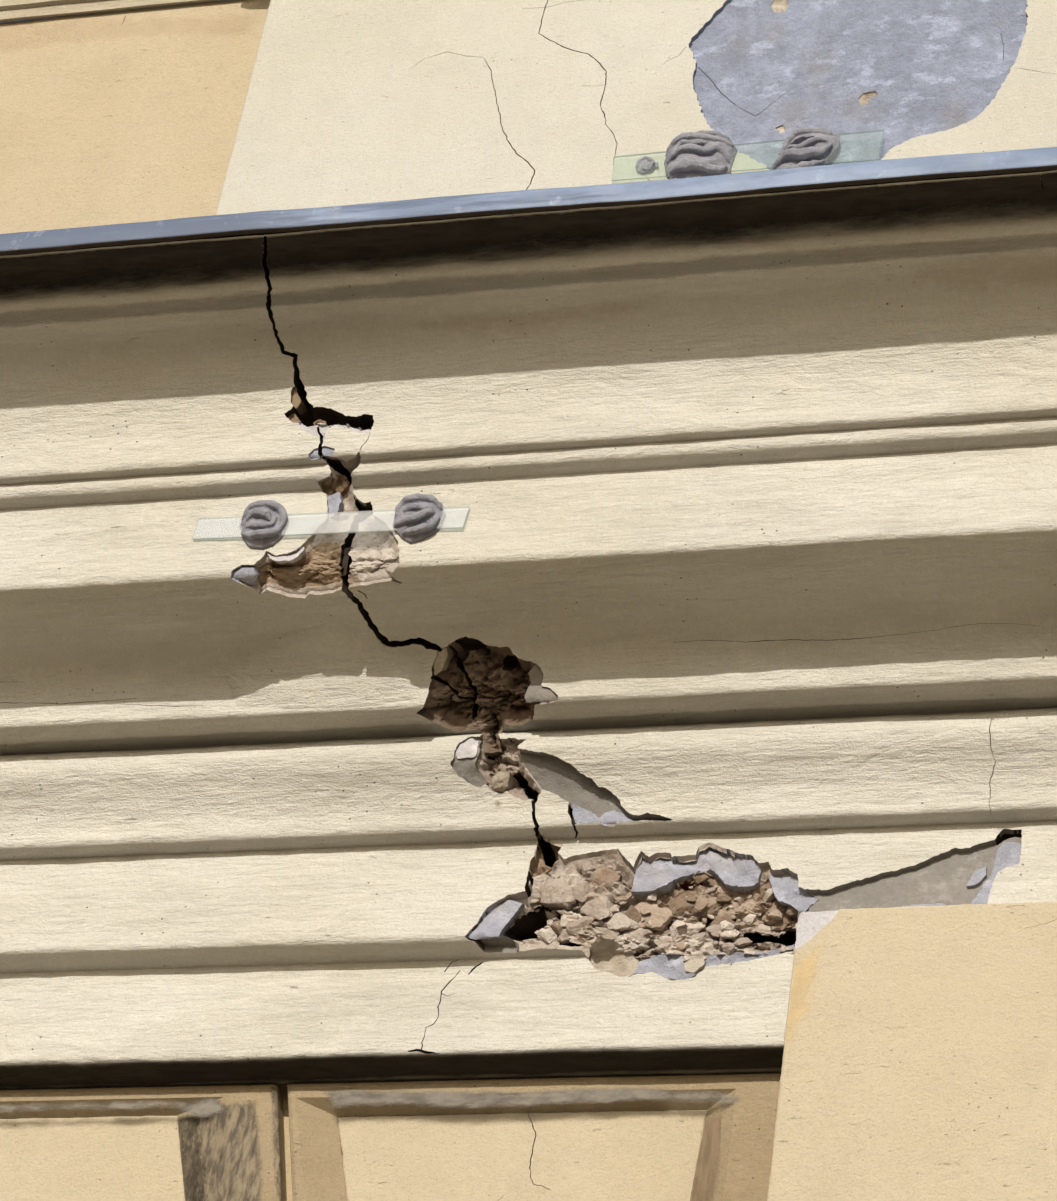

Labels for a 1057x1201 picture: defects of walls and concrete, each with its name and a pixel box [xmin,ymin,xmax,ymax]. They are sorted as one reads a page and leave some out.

crack [410,52,535,190]
crack [522,0,618,165]
peeling [689,0,1028,170]
crack [261,234,311,409]
flaking render [231,387,401,598]
crack [341,547,443,652]
flaking render [416,636,672,838]
crack [525,800,561,898]
flaking render [465,829,1022,980]
crack [408,960,482,1054]